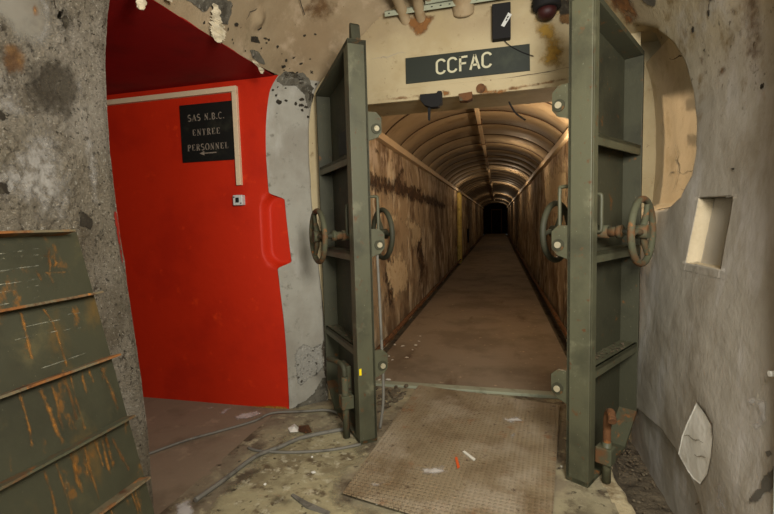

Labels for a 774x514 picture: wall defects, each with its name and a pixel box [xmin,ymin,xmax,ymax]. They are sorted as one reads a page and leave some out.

spalling [187,0,239,44]
corrosion [409,16,433,35]
damp [538,24,562,63]
damp [417,238,425,285]
peeling [749,467,774,502]